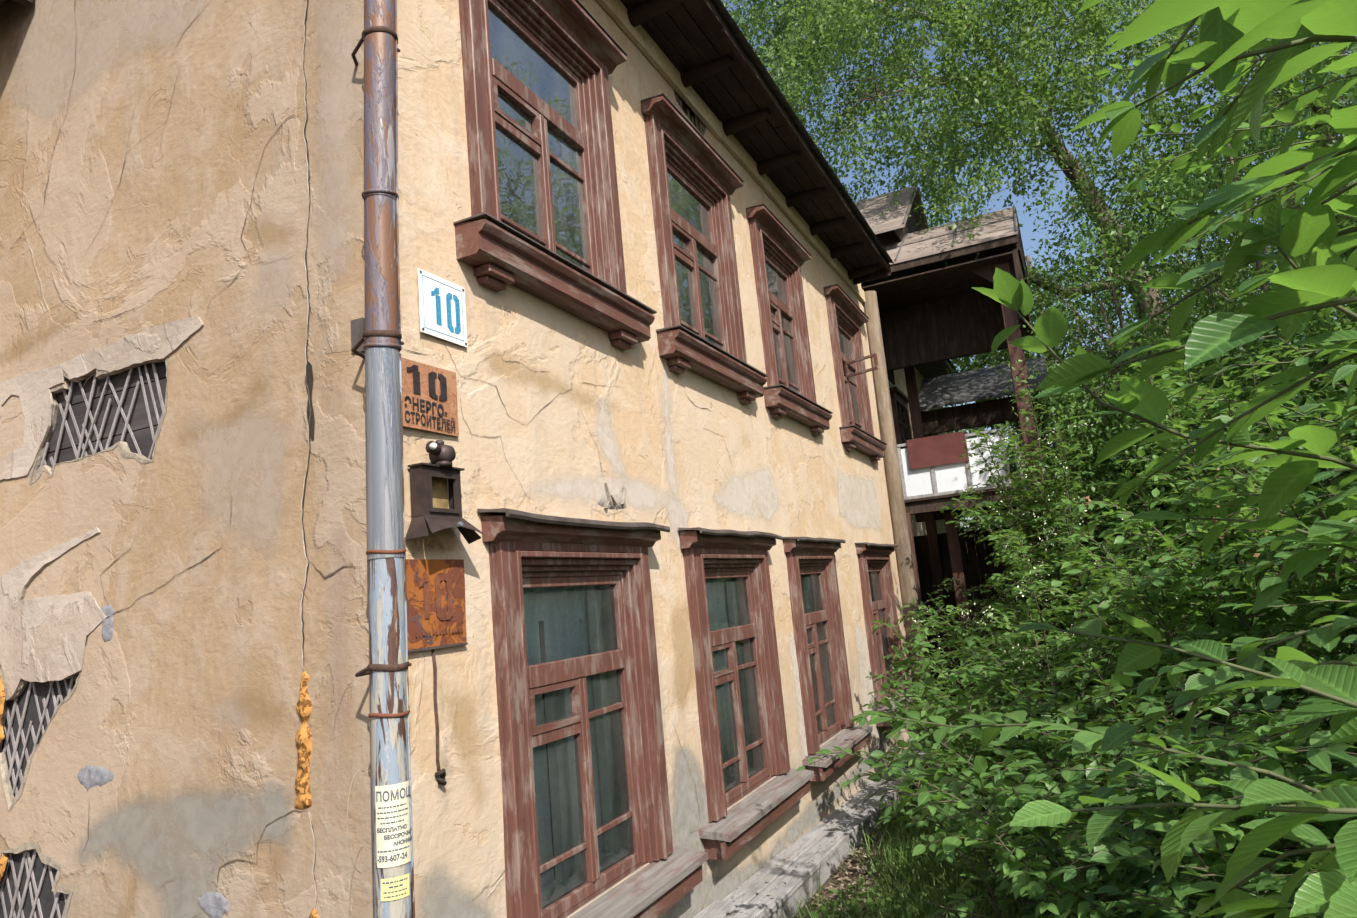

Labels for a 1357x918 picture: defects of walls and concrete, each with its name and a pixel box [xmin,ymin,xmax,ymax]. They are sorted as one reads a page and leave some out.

spalling [0,317,204,485]
crack [207,0,358,670]
crack [404,342,623,498]
crack [85,487,231,646]
peeling [0,527,107,812]
spalling [0,842,73,918]
leakage [81,790,287,918]